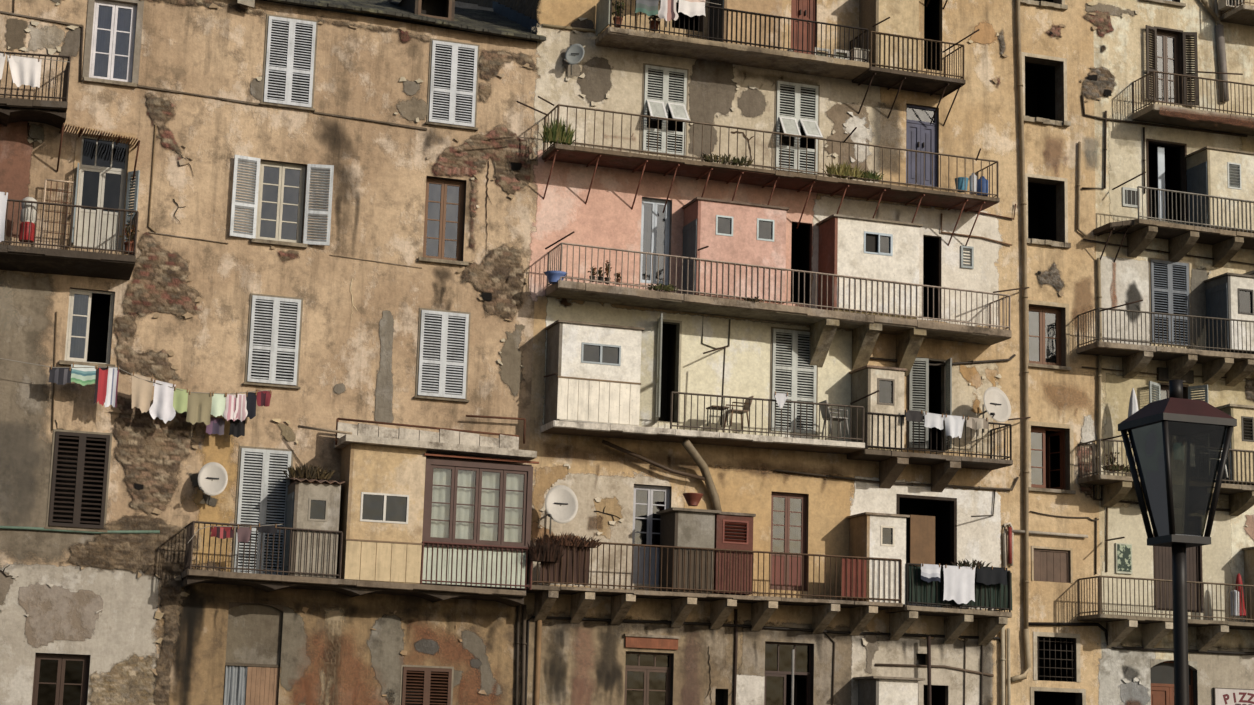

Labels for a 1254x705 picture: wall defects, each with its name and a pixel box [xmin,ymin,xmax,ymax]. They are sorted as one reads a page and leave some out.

peeling [5,18,84,60]
spalling [1046,24,1066,38]
spalling [1080,1,1139,102]
spalling [145,93,194,165]
spalling [114,232,202,384]
spalling [426,124,537,396]
spalling [1037,262,1065,296]
spalling [60,395,218,705]
peeling [1244,515,1254,540]
peeling [0,572,103,648]